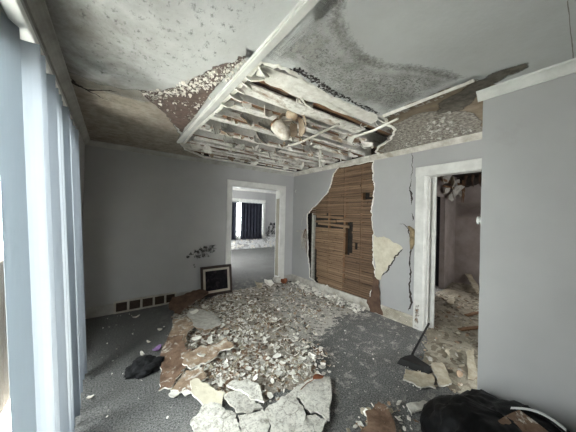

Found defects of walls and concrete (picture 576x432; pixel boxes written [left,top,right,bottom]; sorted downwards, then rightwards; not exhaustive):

crack [71,78,115,102]
water stain [68,72,202,158]
peeling [141,56,246,132]
flaking render [191,144,212,155]
flaking render [221,72,265,110]
mould [289,62,378,114]
peeling [375,111,482,153]
flaking render [307,161,403,315]
crack [404,155,414,311]